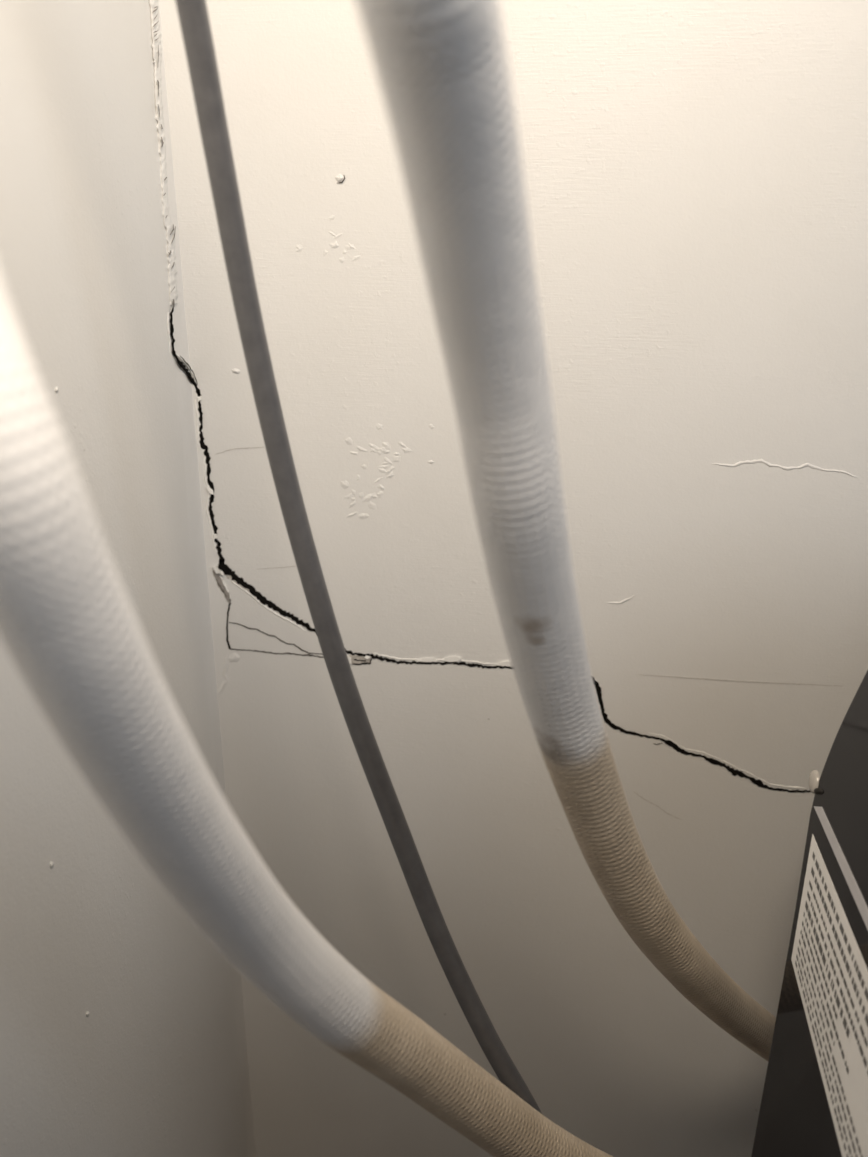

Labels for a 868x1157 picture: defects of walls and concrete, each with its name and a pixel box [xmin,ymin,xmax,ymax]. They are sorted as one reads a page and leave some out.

crack [167,307,513,669]
crack [592,677,811,793]
crack [639,674,838,686]